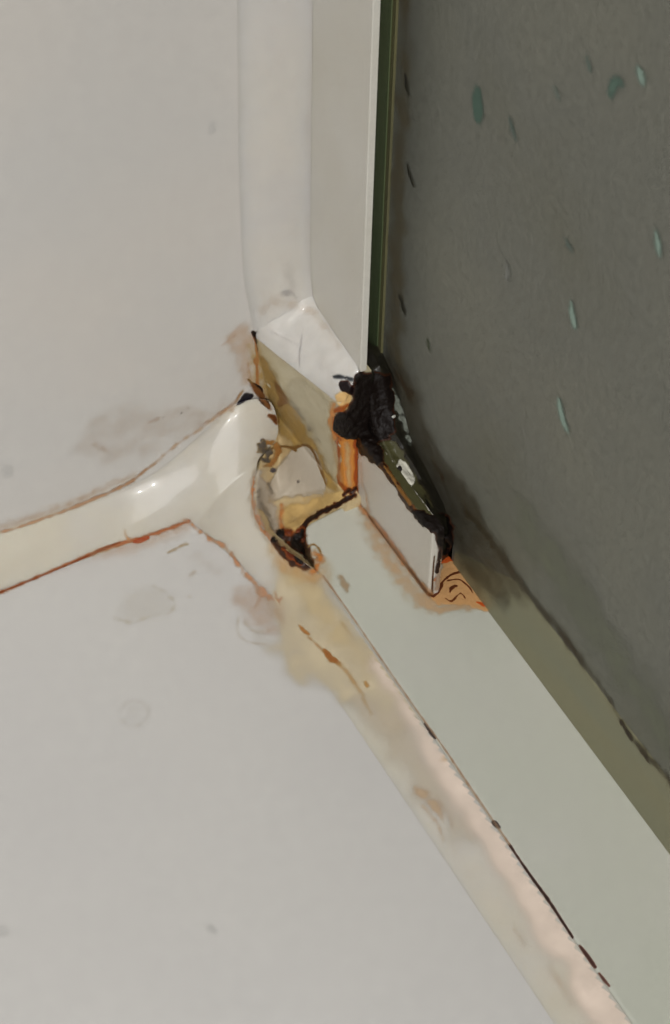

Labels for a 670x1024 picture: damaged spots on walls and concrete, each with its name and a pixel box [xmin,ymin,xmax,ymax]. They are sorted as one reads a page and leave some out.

peeling [268,444,327,500]
rust [277,392,488,614]
rust [0,519,282,603]
rust [299,625,369,687]
water stain [270,527,630,1024]